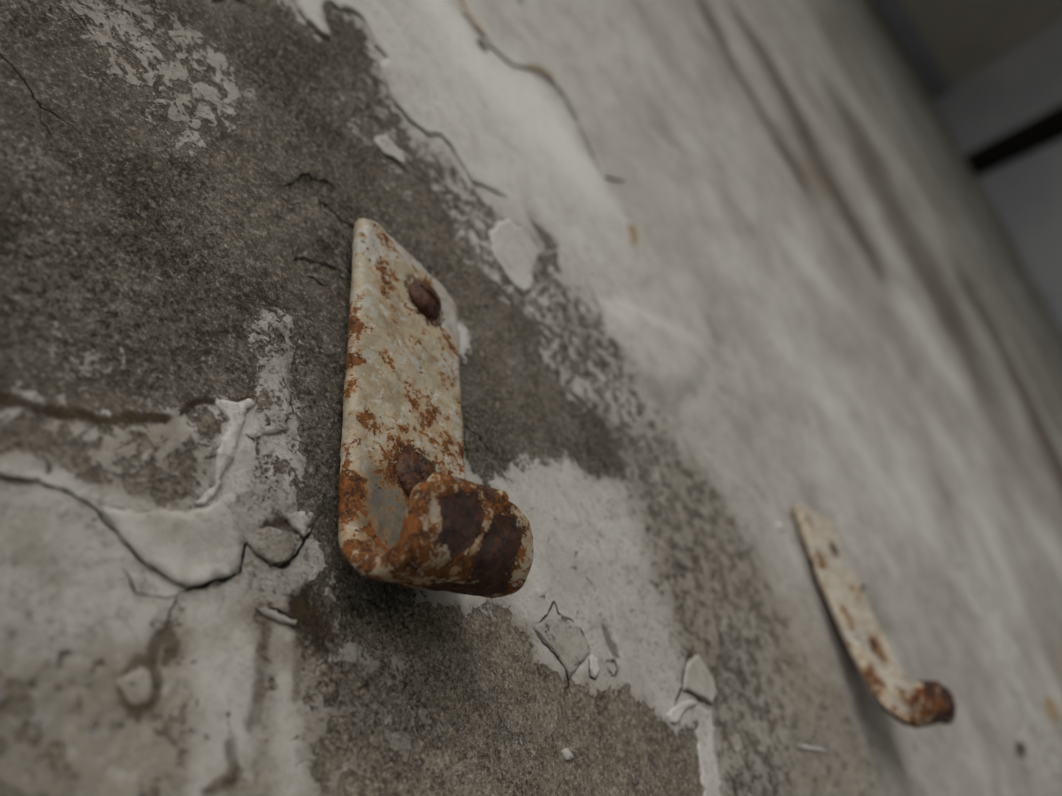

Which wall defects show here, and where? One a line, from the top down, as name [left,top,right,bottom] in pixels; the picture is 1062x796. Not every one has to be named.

peeling [292,0,508,198]
peeling [457,0,626,183]
crack [538,71,601,173]
spalling [294,256,336,286]
peeling [488,215,562,295]
spalling [98,316,314,588]
crack [0,473,248,631]
spalling [255,606,297,626]
peeling [533,601,600,689]
spalling [602,624,619,658]
peeling [666,652,723,796]